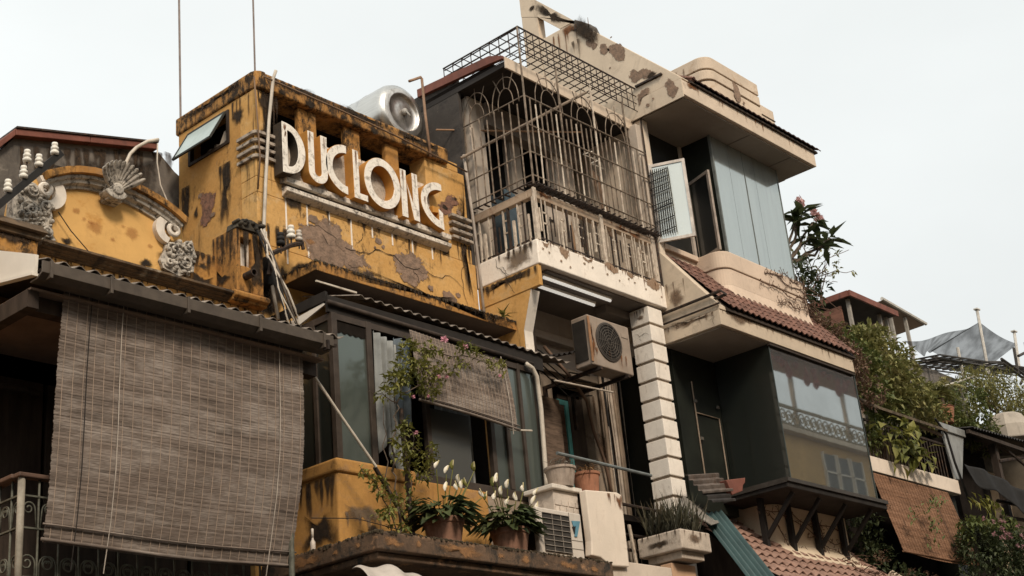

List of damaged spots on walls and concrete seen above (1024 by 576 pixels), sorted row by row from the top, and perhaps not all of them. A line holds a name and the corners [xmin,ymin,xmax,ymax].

peeling [586,36,678,107]
leakage [181,75,388,158]
spalling [194,191,216,227]
leakage [219,161,230,220]
leakage [284,185,318,211]
leakage [51,220,517,324]
flaking render [298,215,461,303]
crack [312,225,468,304]
leakage [300,475,335,550]